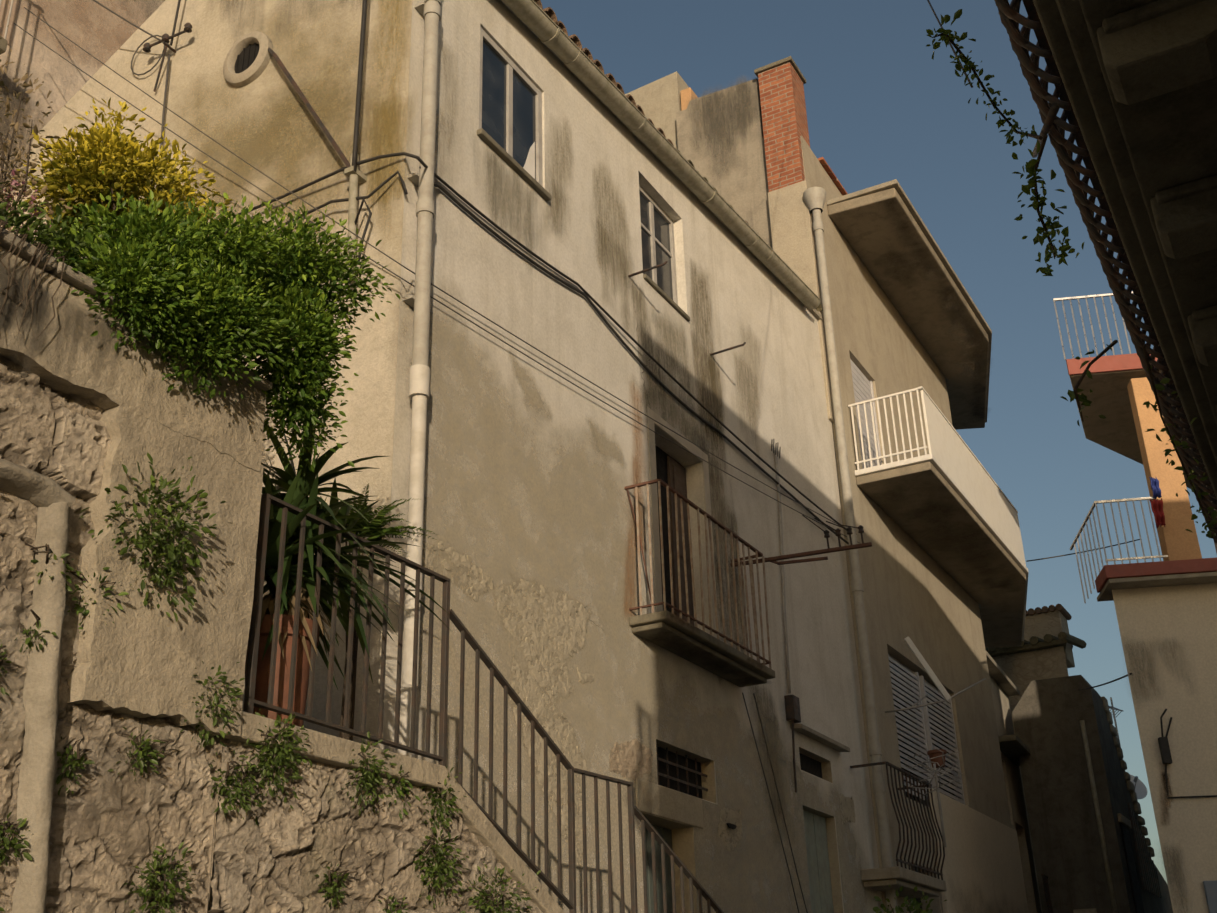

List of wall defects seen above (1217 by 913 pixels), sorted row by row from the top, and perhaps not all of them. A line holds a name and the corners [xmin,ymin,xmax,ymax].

peeling [418,312,866,913]
damp [692,272,742,648]